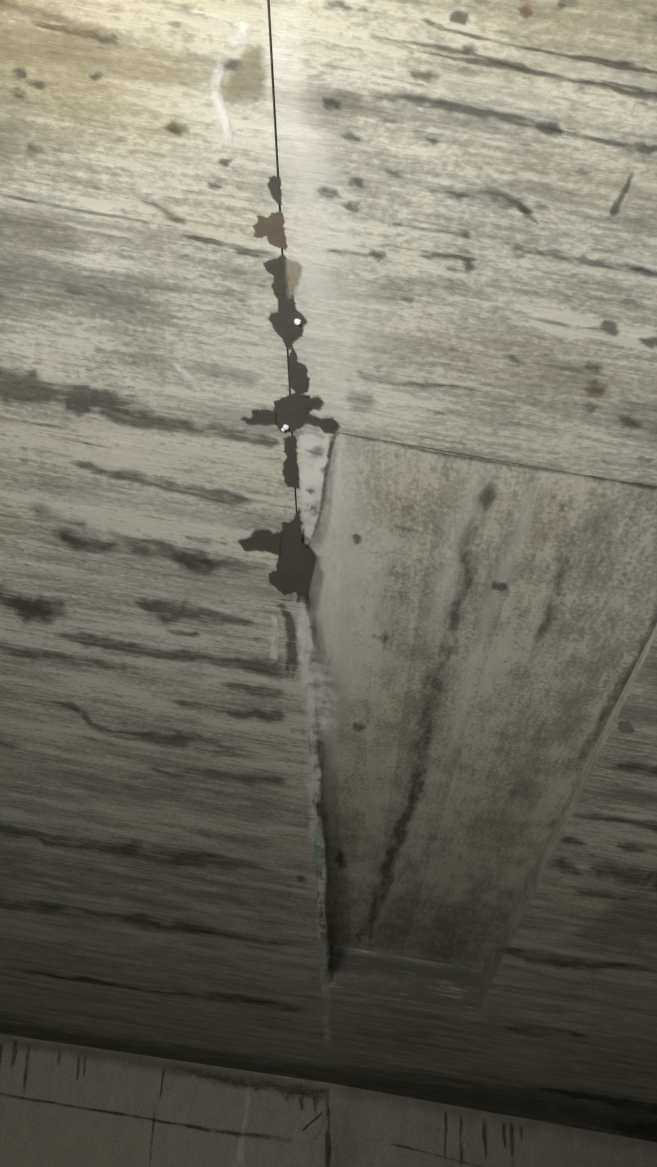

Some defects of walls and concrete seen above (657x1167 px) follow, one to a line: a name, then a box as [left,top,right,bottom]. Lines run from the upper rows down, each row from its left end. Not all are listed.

water stain [0,371,206,432]
water stain [61,176,339,1045]
water stain [598,662,635,730]
water stain [369,773,421,922]
water stain [587,816,657,831]